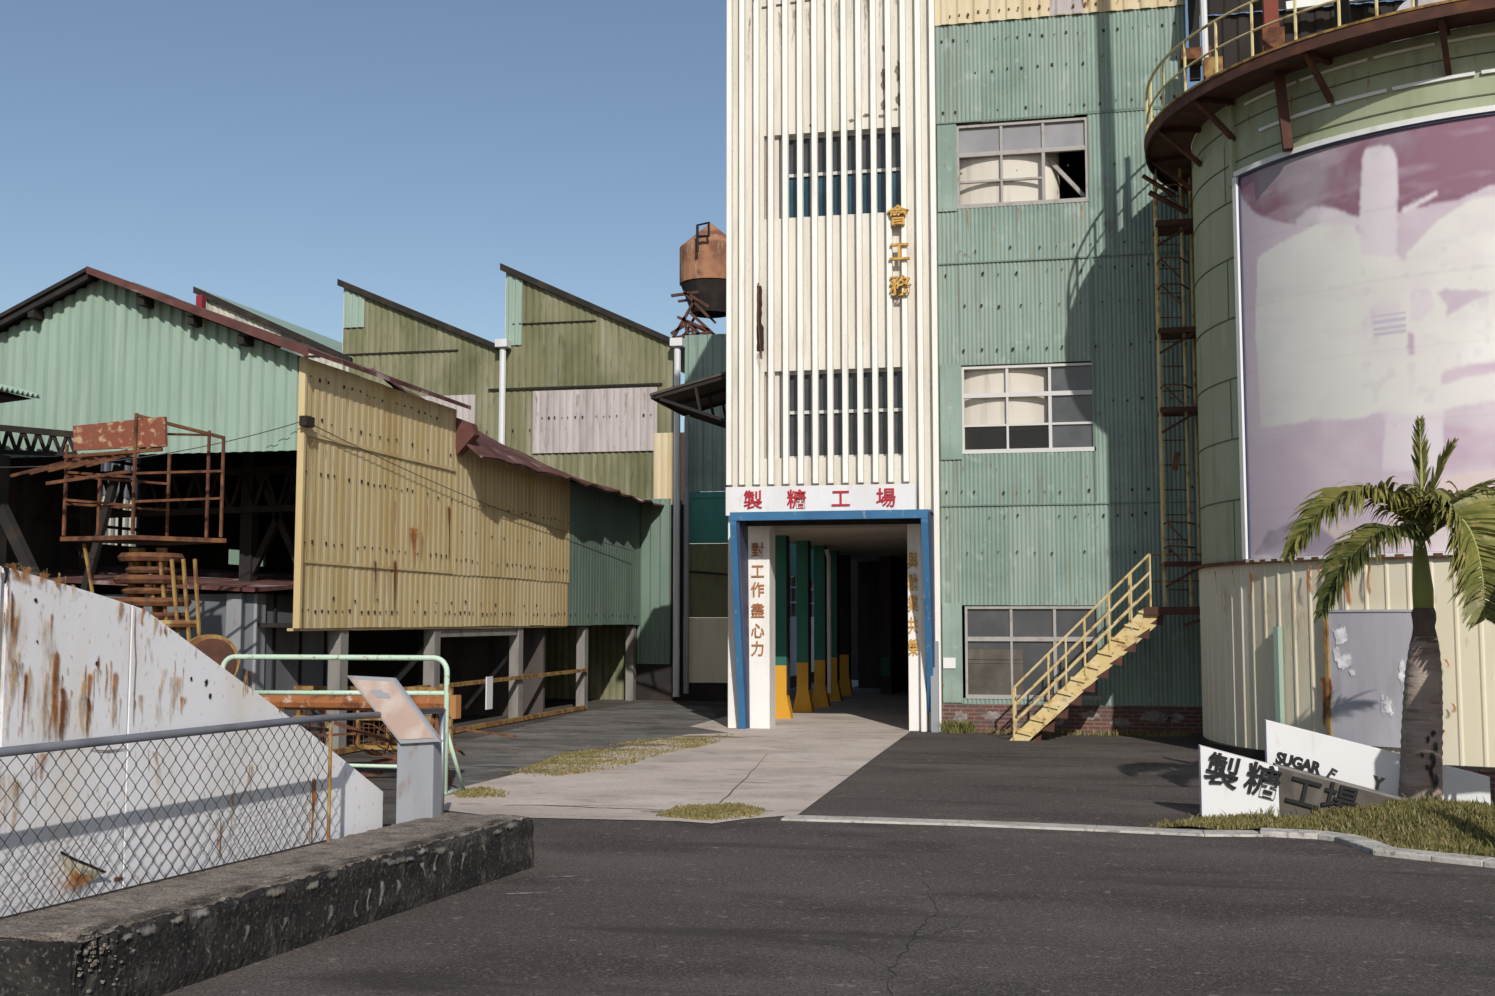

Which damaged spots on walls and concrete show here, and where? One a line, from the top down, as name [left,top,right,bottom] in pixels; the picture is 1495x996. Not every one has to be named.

corrosion [120,602,171,636]
corrosion [0,564,142,827]
corrosion [310,765,319,843]